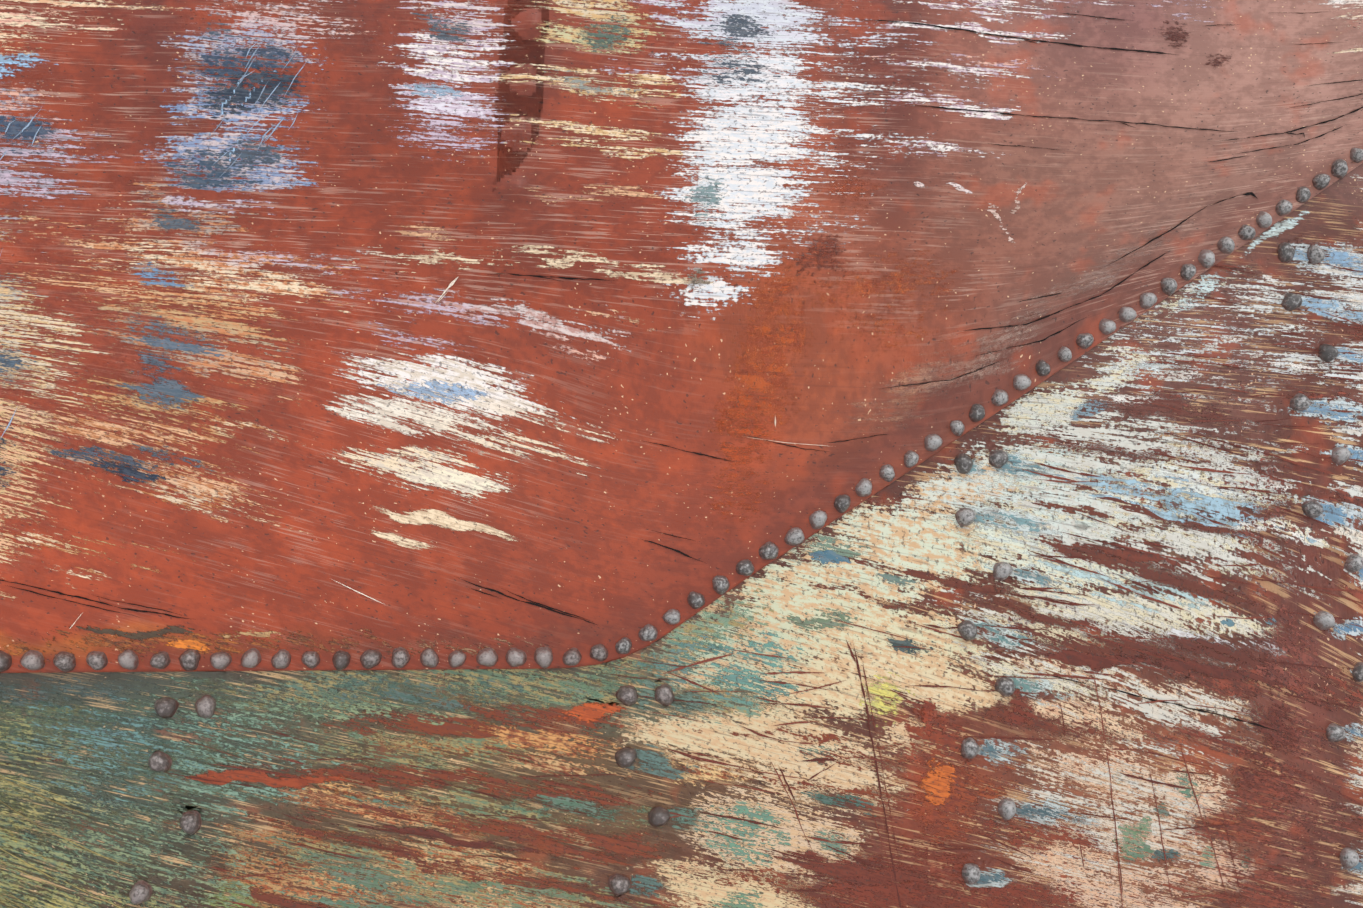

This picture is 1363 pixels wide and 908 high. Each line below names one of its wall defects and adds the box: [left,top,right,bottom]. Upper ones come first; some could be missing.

peeling [0,0,1075,591]
peeling [0,211,1363,908]
peeling [1323,0,1363,32]